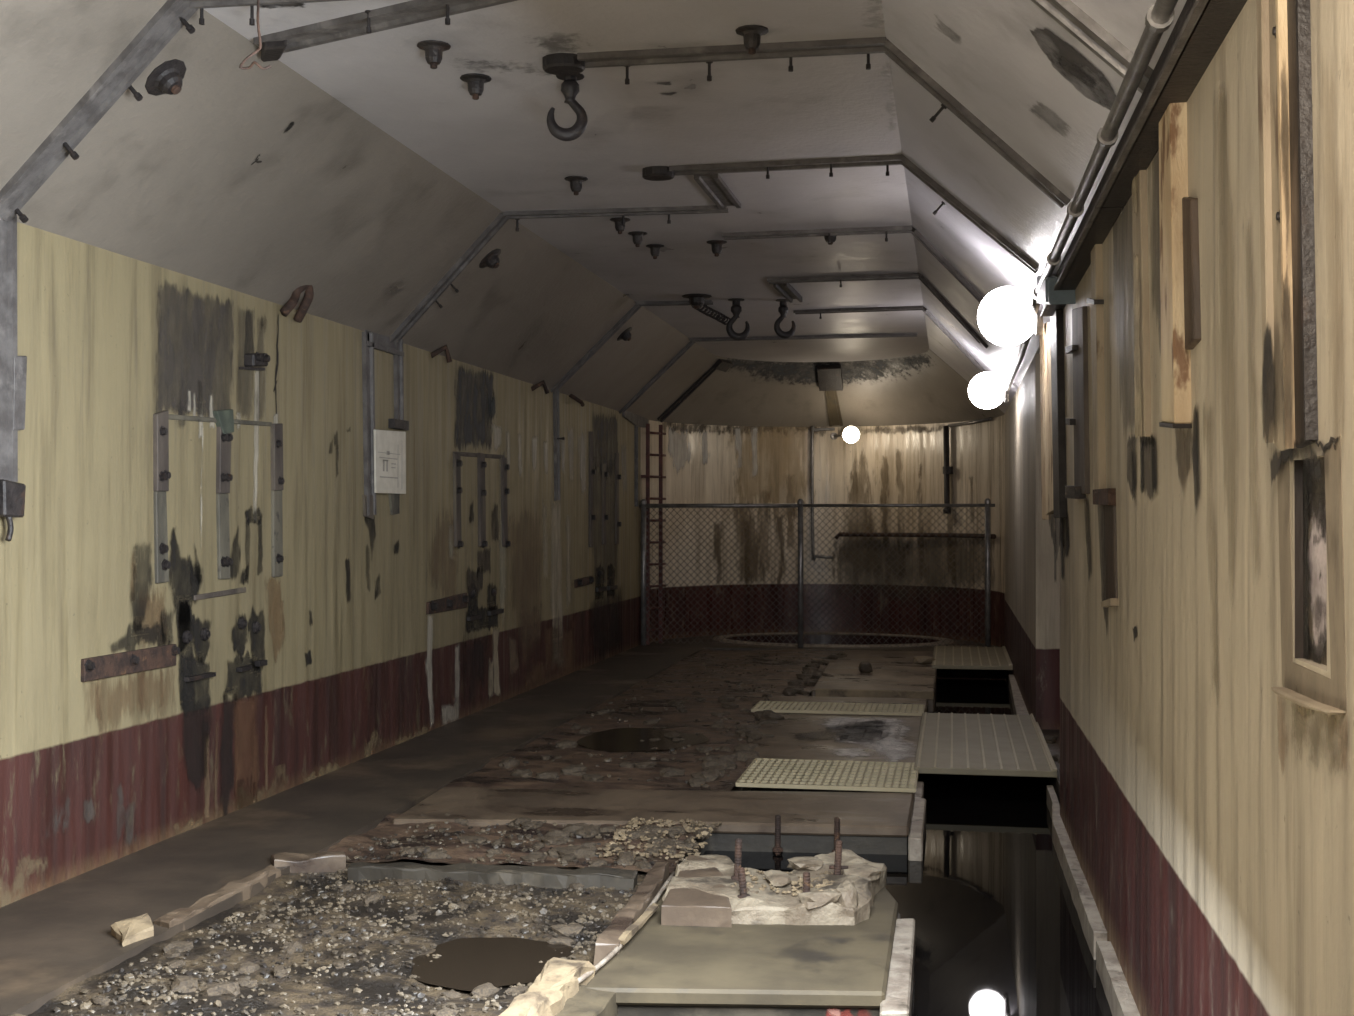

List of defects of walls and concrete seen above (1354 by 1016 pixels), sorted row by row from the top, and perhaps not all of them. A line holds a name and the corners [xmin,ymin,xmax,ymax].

water stain [1031,28,1116,110]
water stain [667,422,858,476]
water stain [875,425,943,433]
water stain [833,451,992,602]
water stain [112,529,288,816]